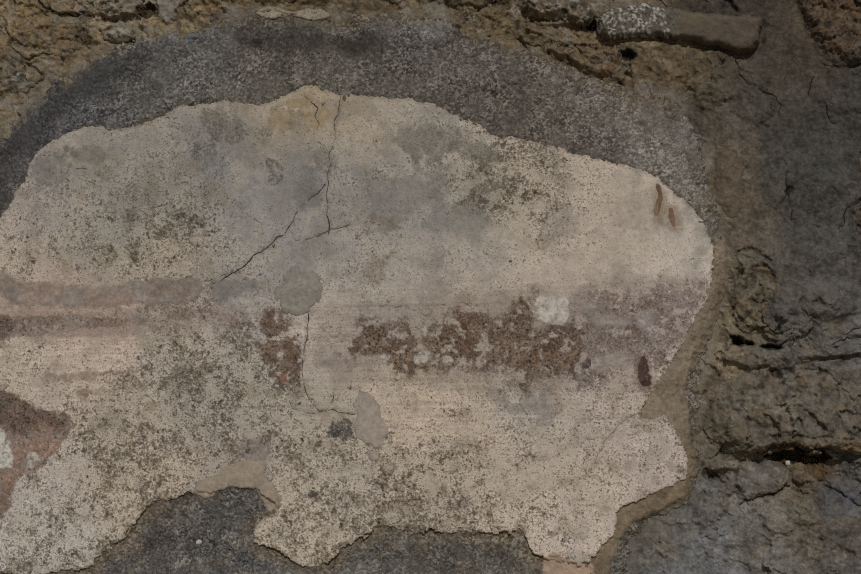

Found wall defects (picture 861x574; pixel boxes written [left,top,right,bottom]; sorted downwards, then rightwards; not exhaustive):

spalling [618,49,636,61]
crack [209,96,348,284]
peeling [0,273,201,341]
spalling [258,309,302,384]
crack [289,313,356,415]
spalling [340,282,705,393]
peeling [0,392,73,519]